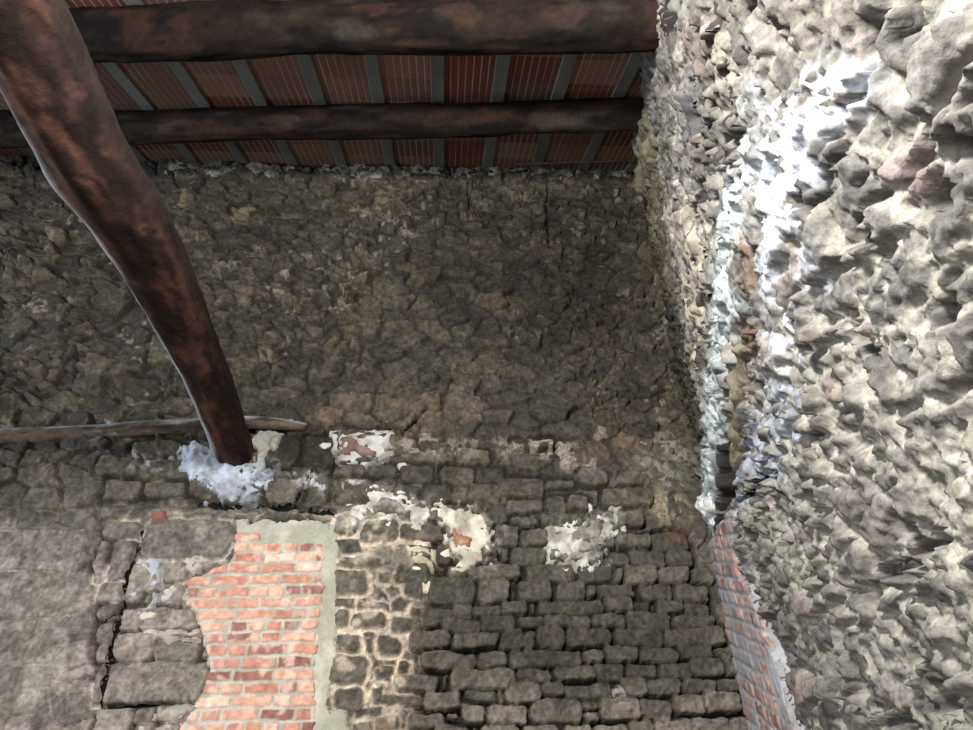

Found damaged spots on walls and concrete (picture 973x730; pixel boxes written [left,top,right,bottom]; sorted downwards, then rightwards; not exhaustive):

flaking render [320,436,377,456]
water stain [648,74,870,536]